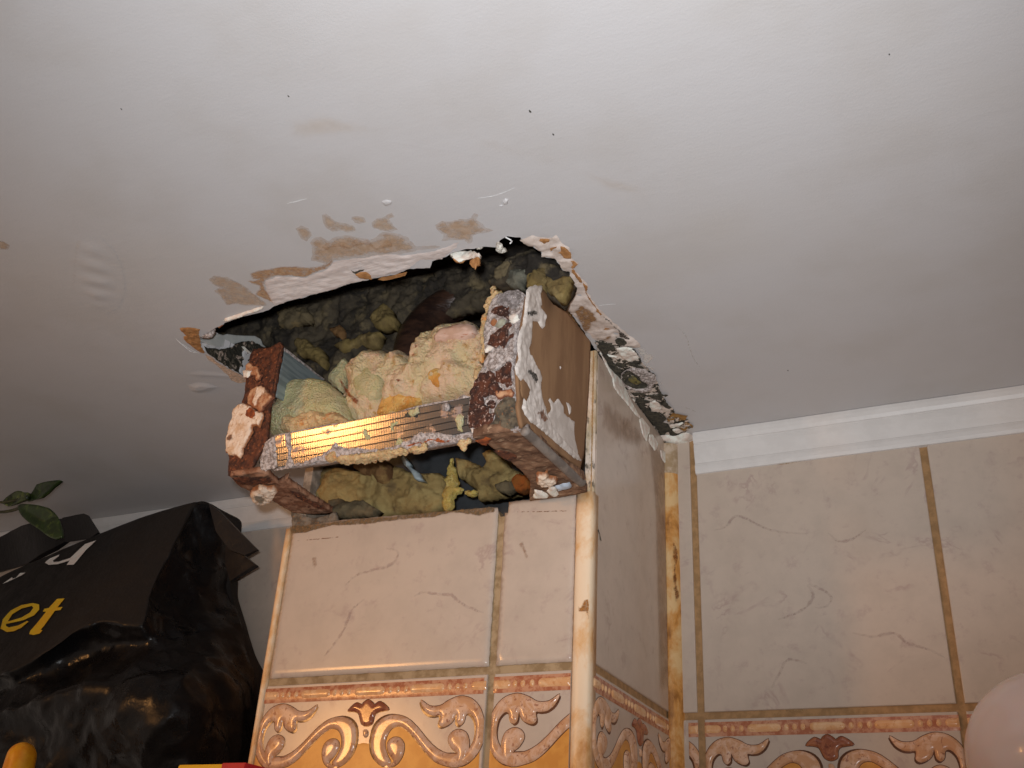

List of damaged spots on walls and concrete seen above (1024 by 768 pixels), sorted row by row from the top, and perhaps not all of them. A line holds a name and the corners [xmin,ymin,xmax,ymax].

peeling [452,250,482,270]
spalling [223,306,263,322]
rust [243,343,280,393]
rust [487,305,514,349]
peeling [520,235,693,463]
rust [468,362,518,461]
rust [232,476,273,485]
spalling [533,469,572,499]